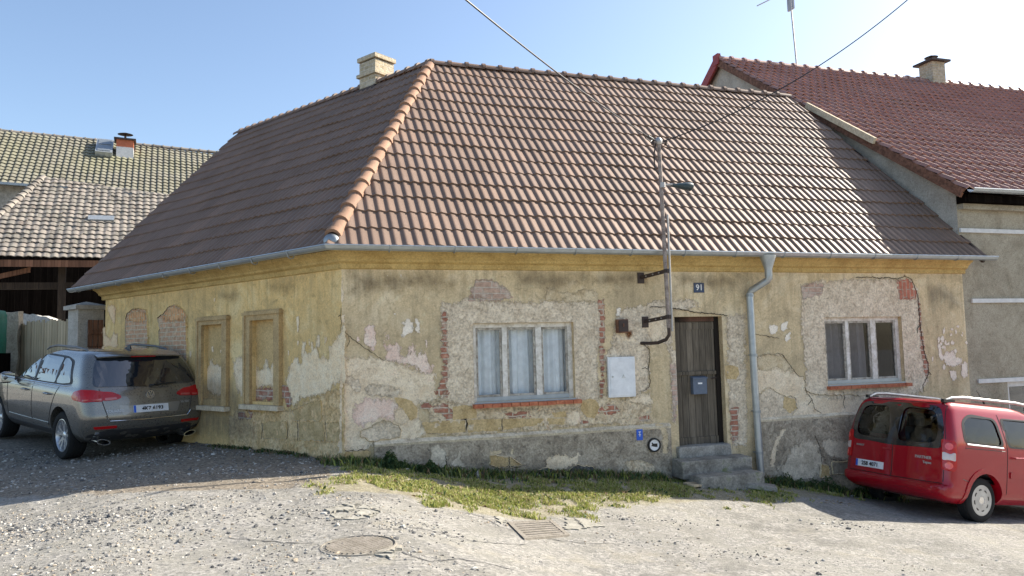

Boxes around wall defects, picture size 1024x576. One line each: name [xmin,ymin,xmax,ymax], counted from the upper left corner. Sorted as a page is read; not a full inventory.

flaking render [103,304,191,364]
peeling [207,346,242,396]
spalling [229,299,678,468]
spalling [468,279,513,303]
crack [856,275,931,392]
peeling [896,278,968,381]